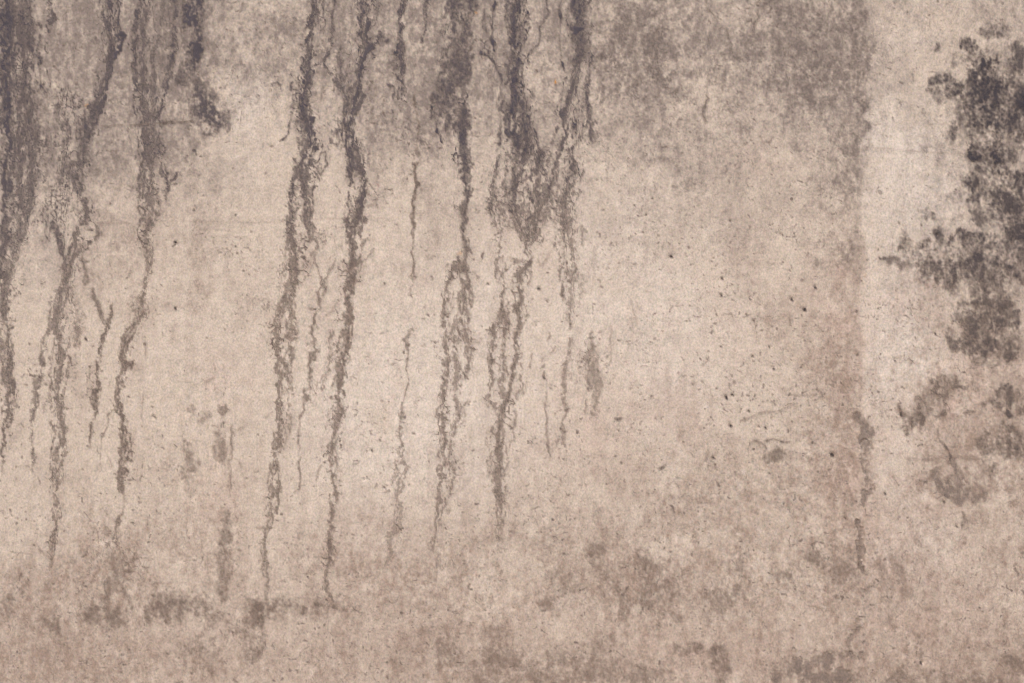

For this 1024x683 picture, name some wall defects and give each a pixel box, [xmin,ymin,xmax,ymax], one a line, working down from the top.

leakage [0,0,229,492]
leakage [302,476,341,612]
leakage [269,0,416,518]
leakage [411,163,420,238]
leakage [430,0,602,513]
mould [898,375,958,435]
mould [920,28,1024,362]
mould [964,383,1021,453]